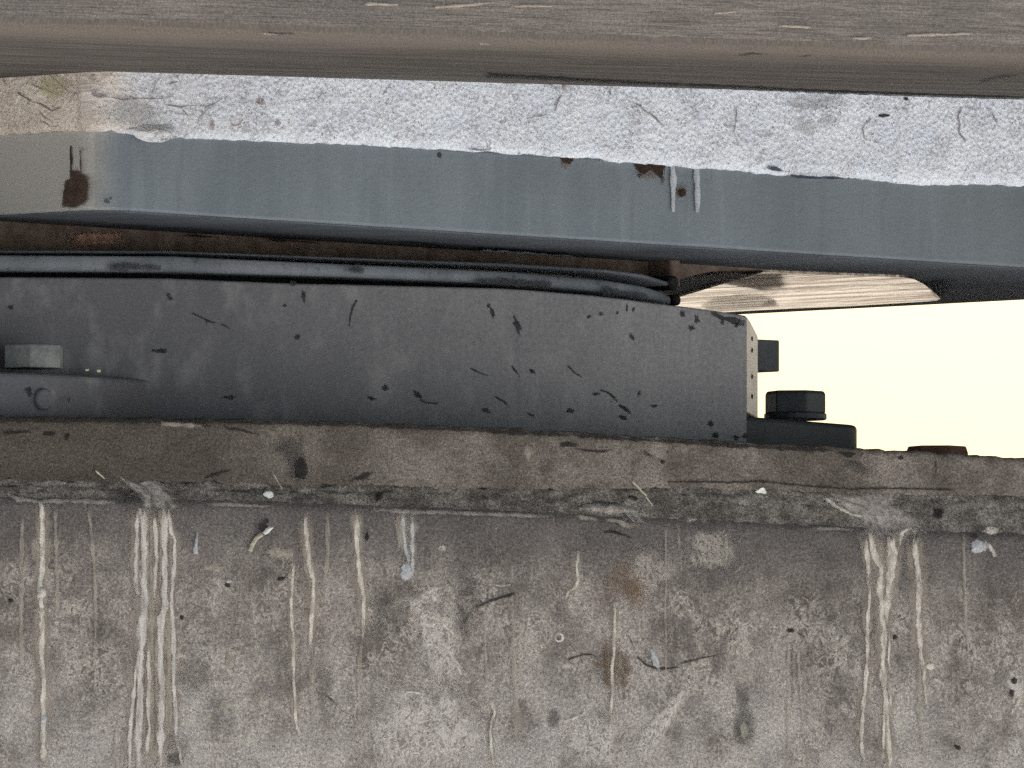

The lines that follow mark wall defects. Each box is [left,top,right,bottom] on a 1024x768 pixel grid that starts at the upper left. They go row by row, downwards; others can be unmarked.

corrosion [62,146,89,208]
corrosion [635,163,666,181]
water stain [32,504,52,762]
water stain [121,477,183,768]
water stain [288,517,320,734]
water stain [352,518,369,636]
water stain [398,517,417,582]
water stain [823,493,927,765]